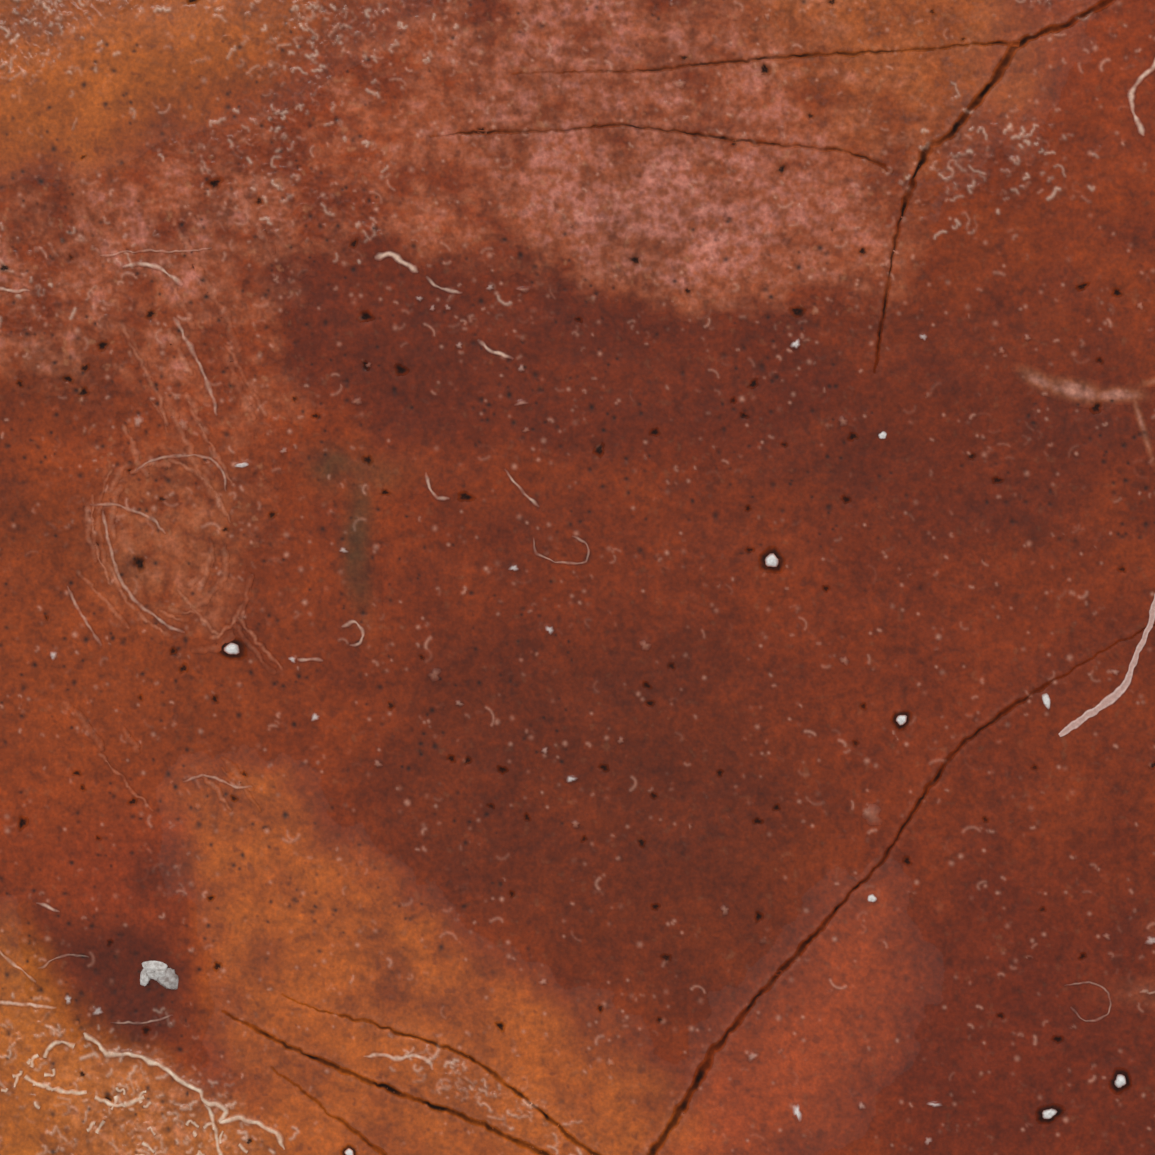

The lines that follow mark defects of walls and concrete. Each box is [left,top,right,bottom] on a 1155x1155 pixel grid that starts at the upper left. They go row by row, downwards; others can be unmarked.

crack [430,0,1116,373]
corrosion [841,0,1100,222]
corrosion [0,895,73,1155]
crack [221,994,602,1155]
corrosion [156,744,945,1155]
crack [646,624,1155,1155]